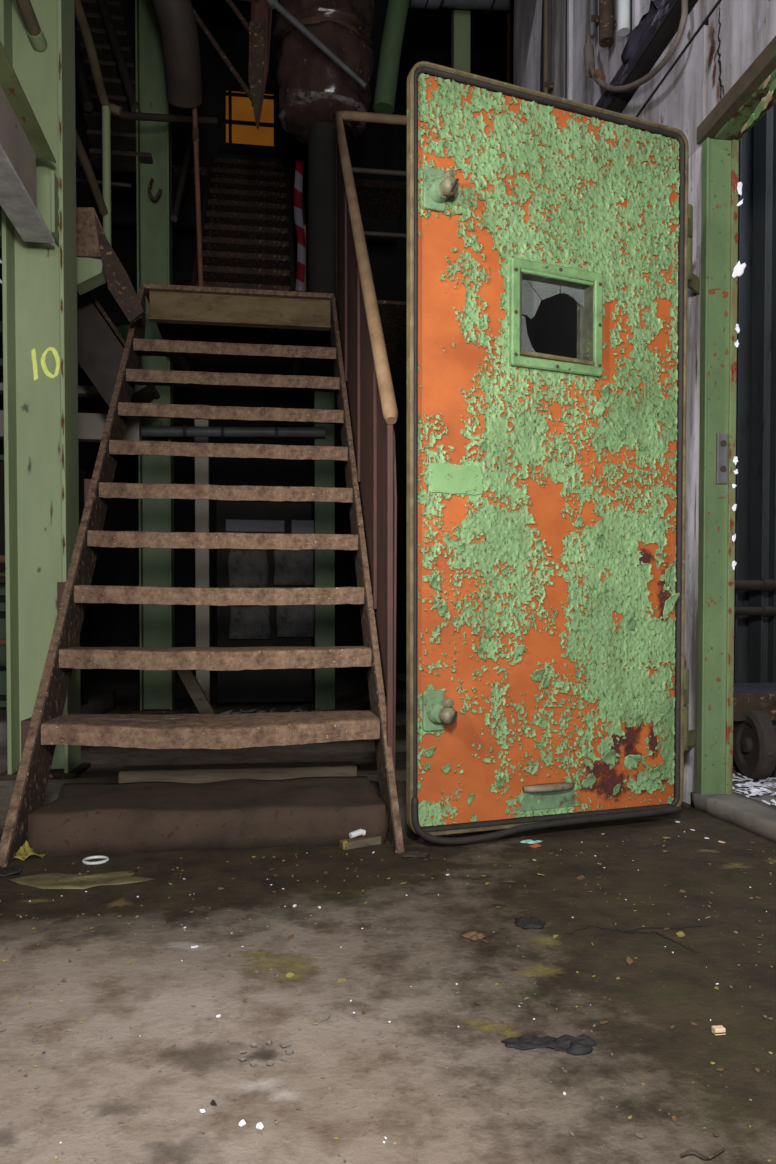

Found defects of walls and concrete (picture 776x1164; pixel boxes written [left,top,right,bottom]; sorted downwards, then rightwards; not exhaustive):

peeling [417,73,680,827]
rust [637,549,670,621]
rust [584,726,667,801]